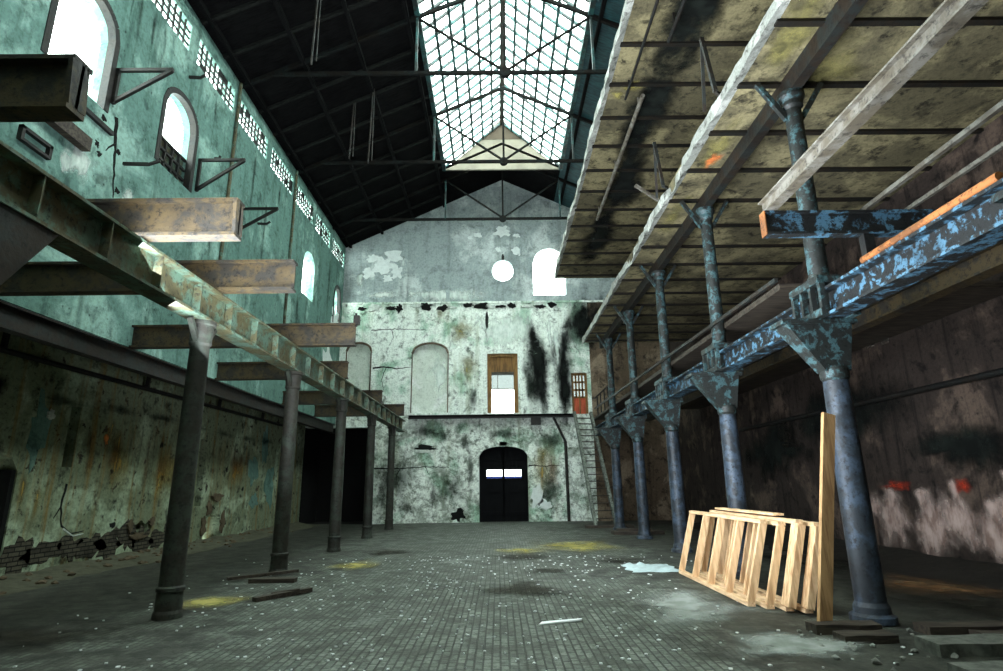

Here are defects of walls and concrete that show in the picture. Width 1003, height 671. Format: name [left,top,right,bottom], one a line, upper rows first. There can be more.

peeling [363,250,403,282]
damp [482,299,603,422]
damp [538,435,558,500]
crack [53,484,84,537]
flaking render [0,516,166,574]